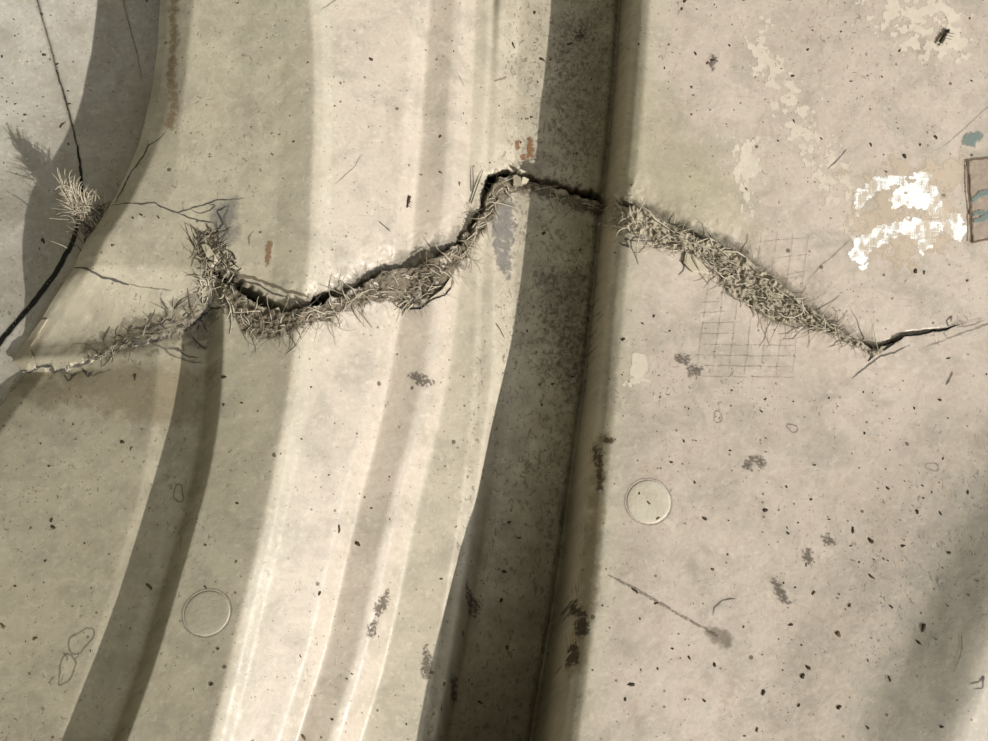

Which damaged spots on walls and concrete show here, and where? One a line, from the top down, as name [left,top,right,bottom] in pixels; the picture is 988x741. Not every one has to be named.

peeling [855,0,974,65]
crack [56,69,83,192]
peeling [728,136,765,218]
peeling [744,16,968,272]
crack [0,131,958,381]